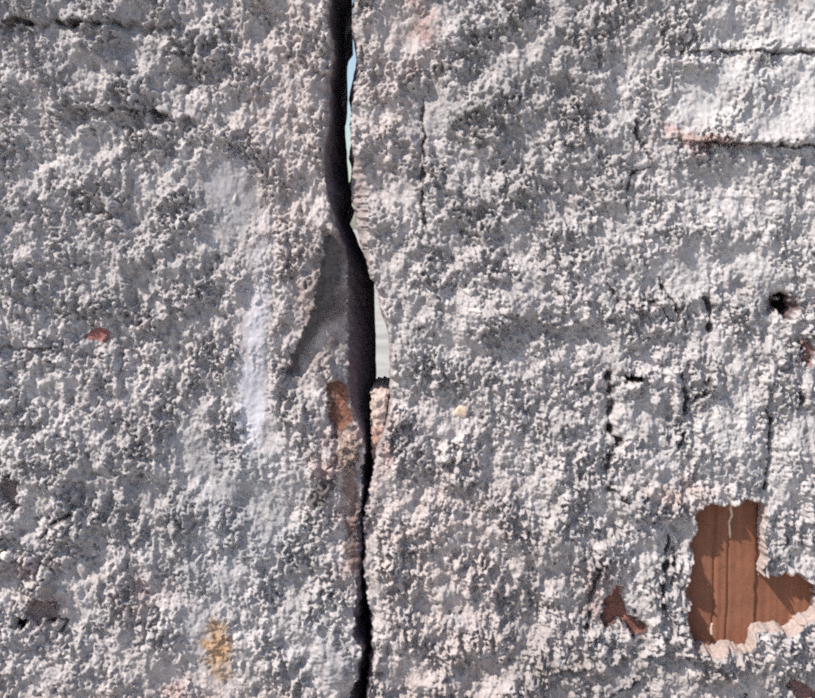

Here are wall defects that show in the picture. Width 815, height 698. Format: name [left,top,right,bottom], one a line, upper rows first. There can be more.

crack [625,117,815,213]
crack [285,0,394,698]
spalling [600,582,646,642]
spalling [685,499,815,660]